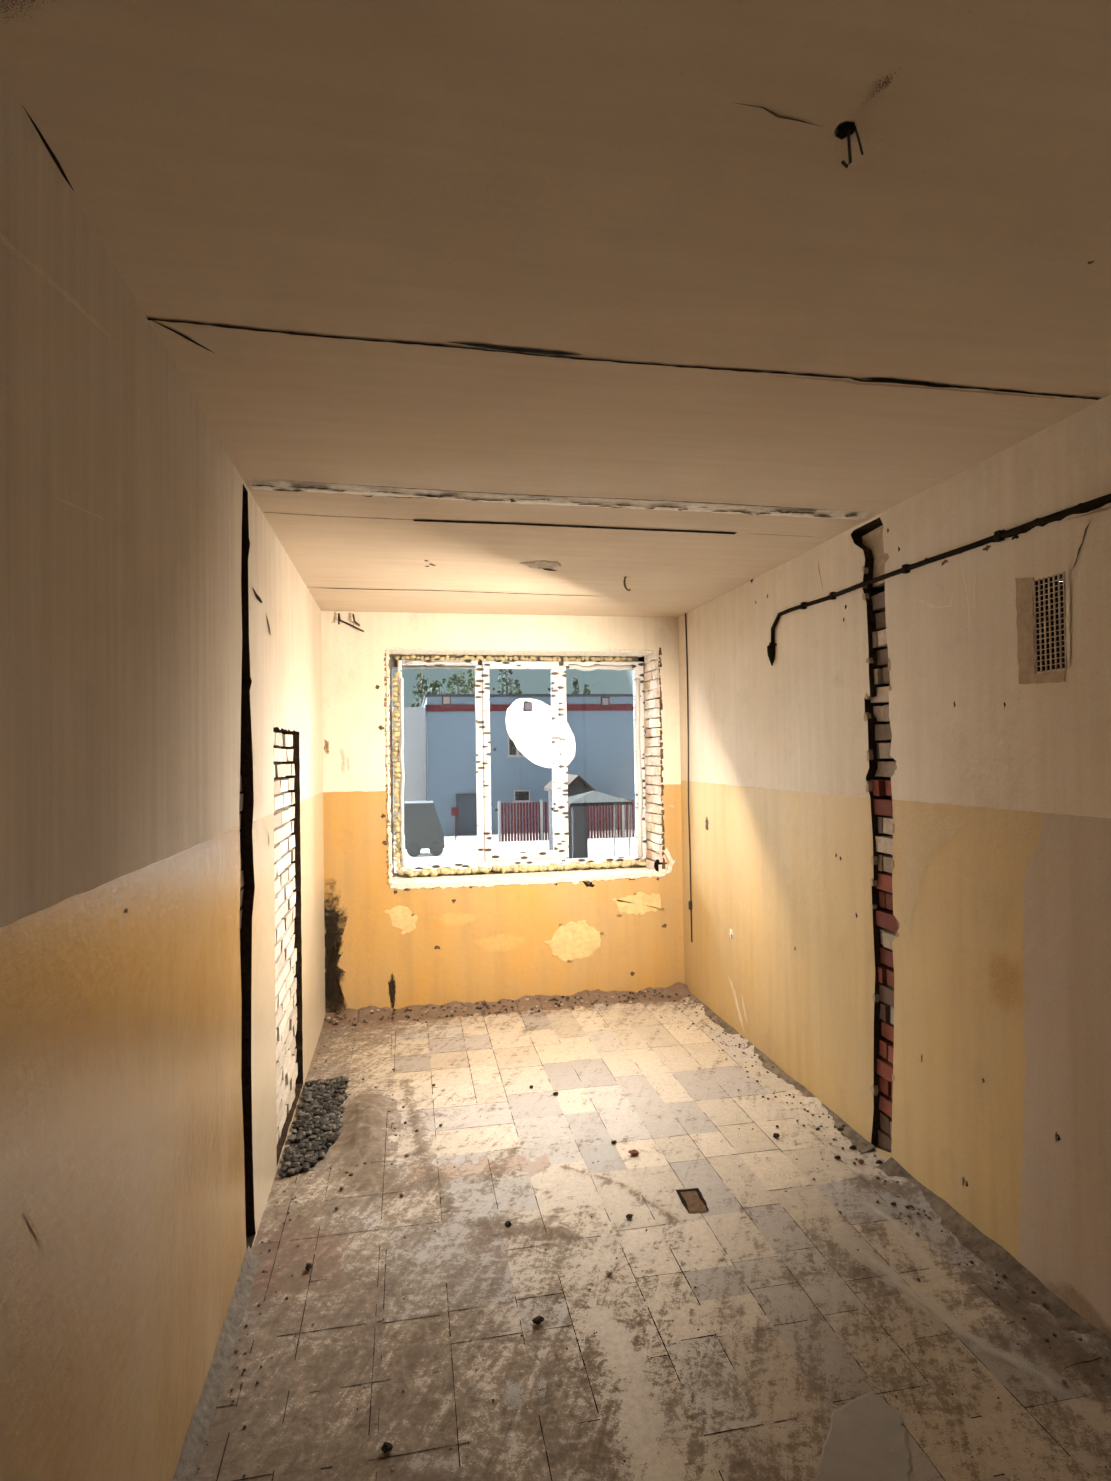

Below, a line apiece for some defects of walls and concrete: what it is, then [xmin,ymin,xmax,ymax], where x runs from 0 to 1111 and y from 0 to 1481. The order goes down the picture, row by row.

crack [23,106,74,191]
crack [147,318,1101,401]
crack [1071,520,1091,571]
spalling [384,647,674,935]
flaking render [866,591,900,1150]
peeling [544,920,604,963]